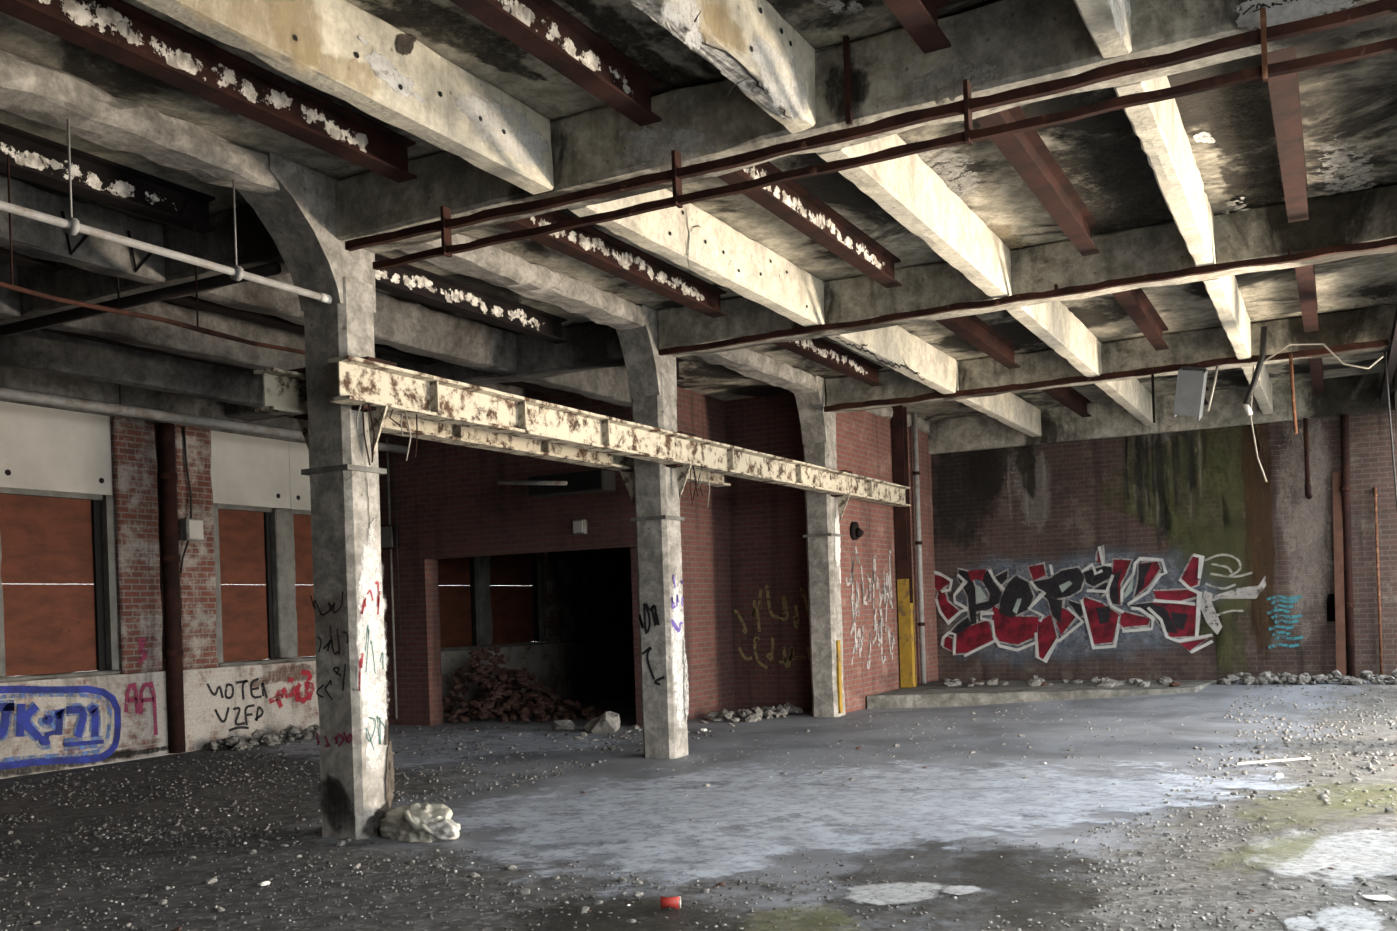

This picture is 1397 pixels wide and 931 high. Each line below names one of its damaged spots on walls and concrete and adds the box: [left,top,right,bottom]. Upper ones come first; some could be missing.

spalling [629,0,793,122]
leakage [1211,100,1285,210]
leakage [932,445,1037,548]
leakage [1125,430,1206,536]